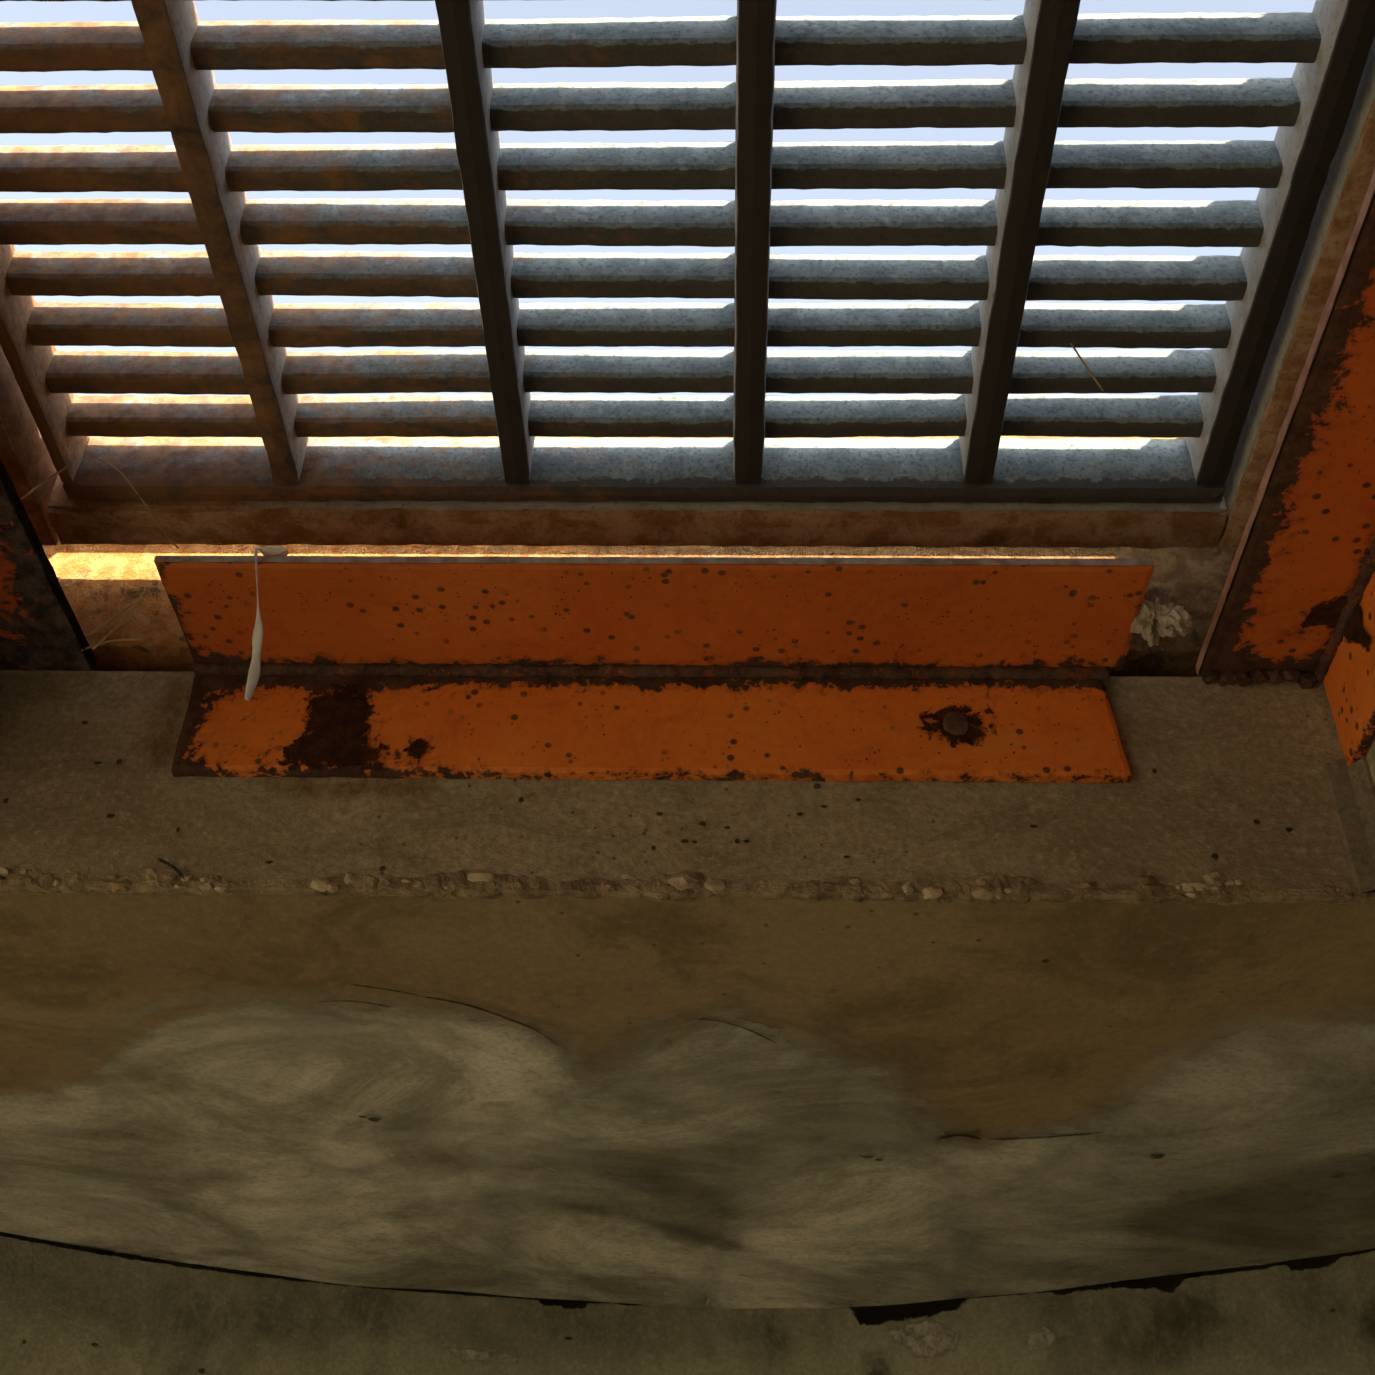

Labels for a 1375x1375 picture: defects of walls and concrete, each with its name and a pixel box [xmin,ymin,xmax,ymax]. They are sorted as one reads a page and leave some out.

rust [1300,591,1371,652]
rust [276,683,436,770]
rust [917,704,998,750]